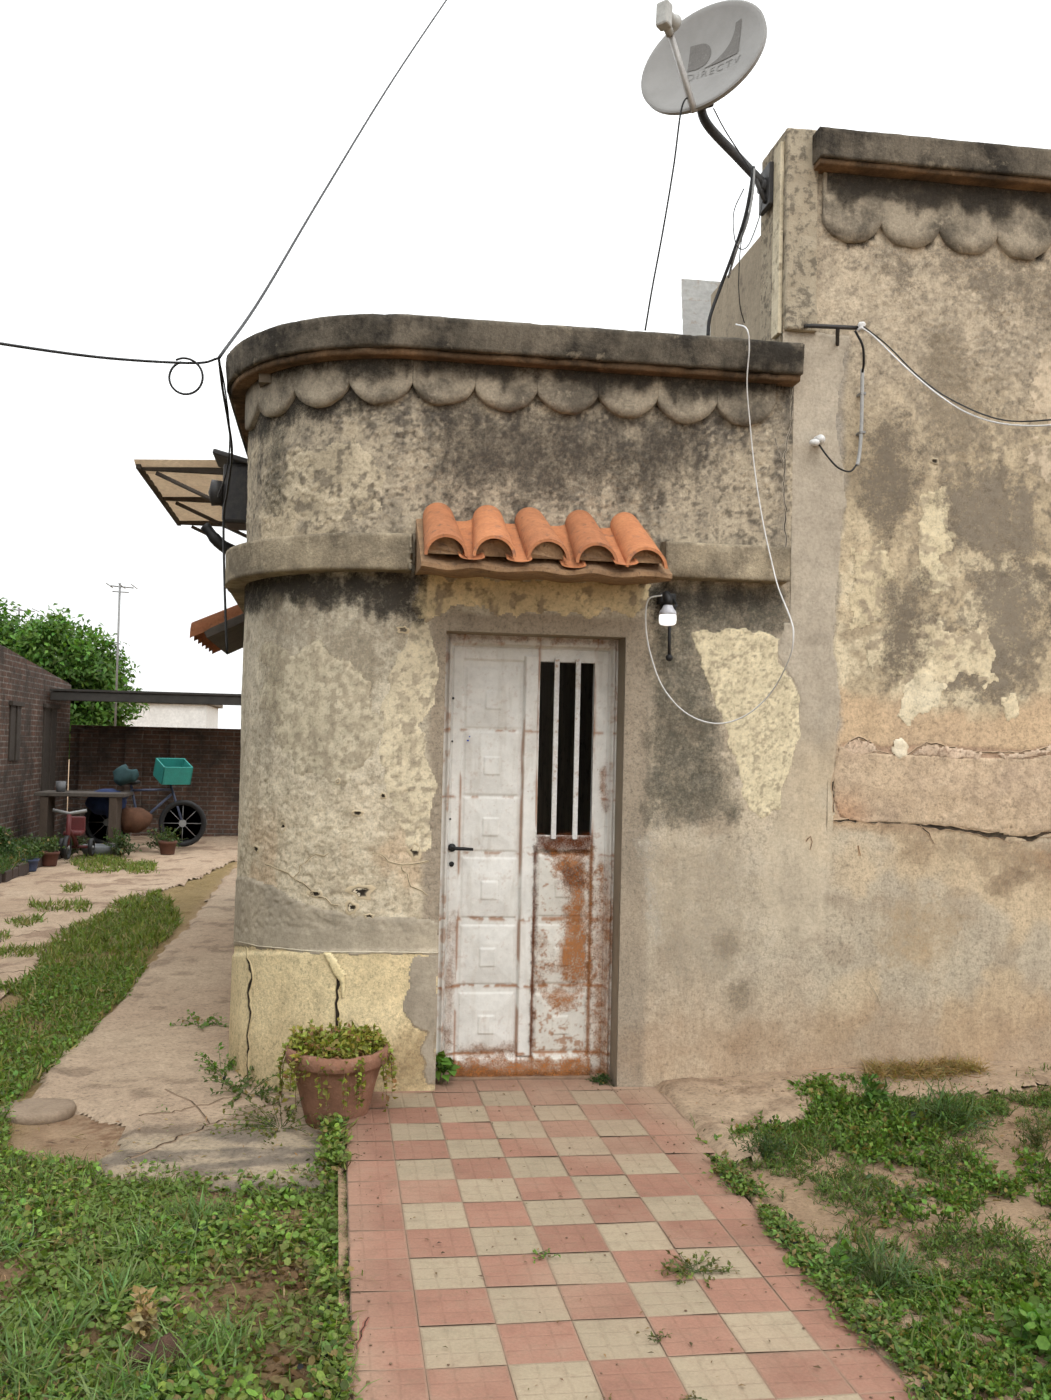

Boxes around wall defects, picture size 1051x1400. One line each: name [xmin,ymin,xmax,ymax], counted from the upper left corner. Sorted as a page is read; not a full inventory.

peeling [691,627,801,818]
spalling [913,744,1051,760]
rust [444,833,613,1077]